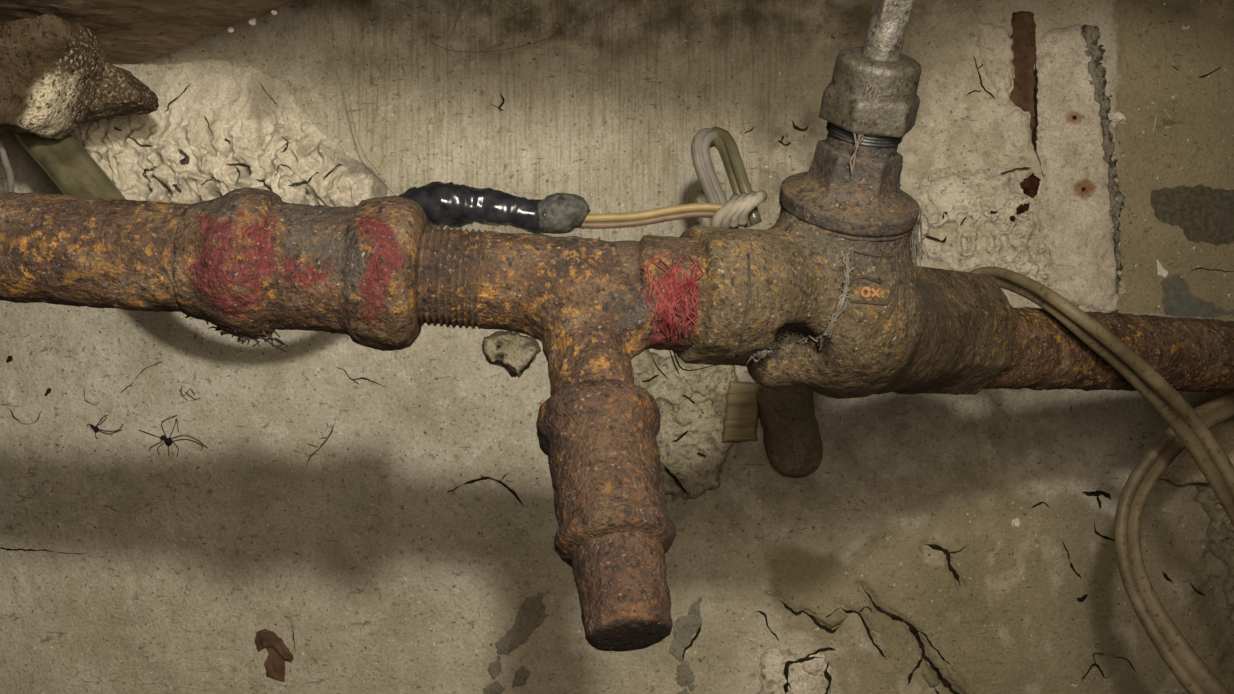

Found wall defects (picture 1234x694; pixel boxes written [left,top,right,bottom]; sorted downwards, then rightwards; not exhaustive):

rust [1076,181,1094,195]
water stain [1151,185,1234,246]
crack [447,472,525,508]
crack [1083,490,1114,541]
crack [925,544,968,585]
crack [1063,542,1087,602]
peeling [669,597,702,694]
crack [756,585,974,694]